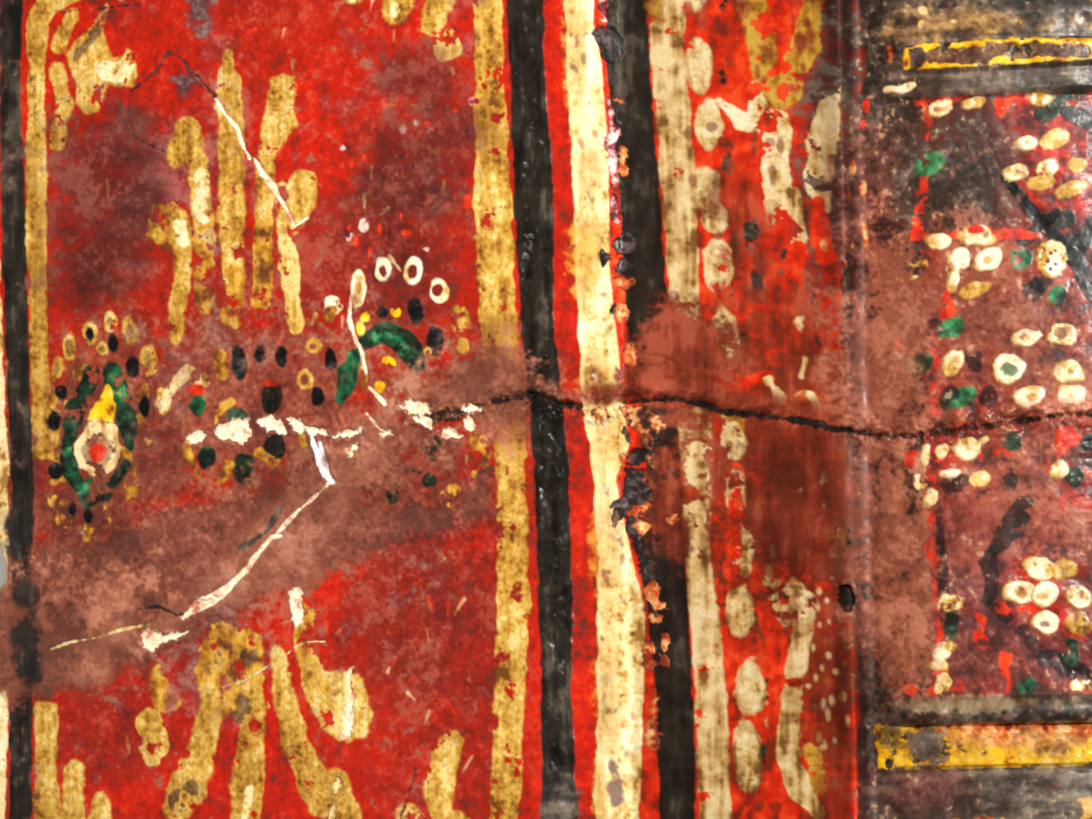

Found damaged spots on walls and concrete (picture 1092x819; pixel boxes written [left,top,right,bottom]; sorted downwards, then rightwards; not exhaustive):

crack [59,3,139,13]
peeling [592,0,624,64]
crack [130,51,309,228]
peeling [599,97,640,290]
peeling [610,302,629,323]
peeling [186,414,362,457]
crack [428,392,582,418]
crack [623,396,1092,439]
water stain [0,347,543,709]
peeling [288,587,306,627]
peeling [141,627,189,652]
peeling [341,667,356,739]